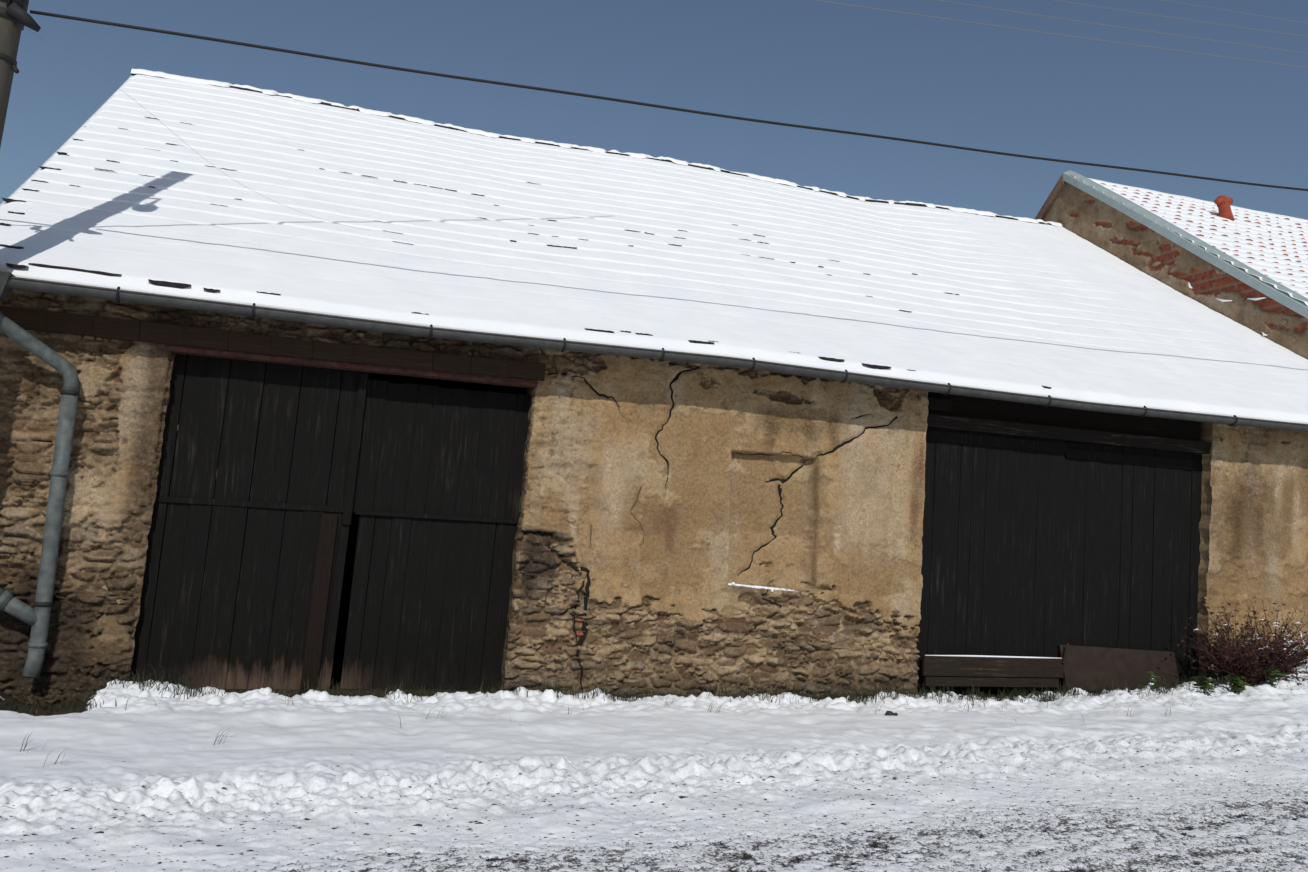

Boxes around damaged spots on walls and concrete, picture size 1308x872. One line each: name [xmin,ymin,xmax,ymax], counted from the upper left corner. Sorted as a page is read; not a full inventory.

flaking render [0,330,175,704]
flaking render [0,289,190,326]
crack [521,530,599,690]
flaking render [524,347,607,376]
crack [546,371,623,417]
crack [630,367,699,543]
flaking render [503,388,920,699]
crack [731,414,898,643]